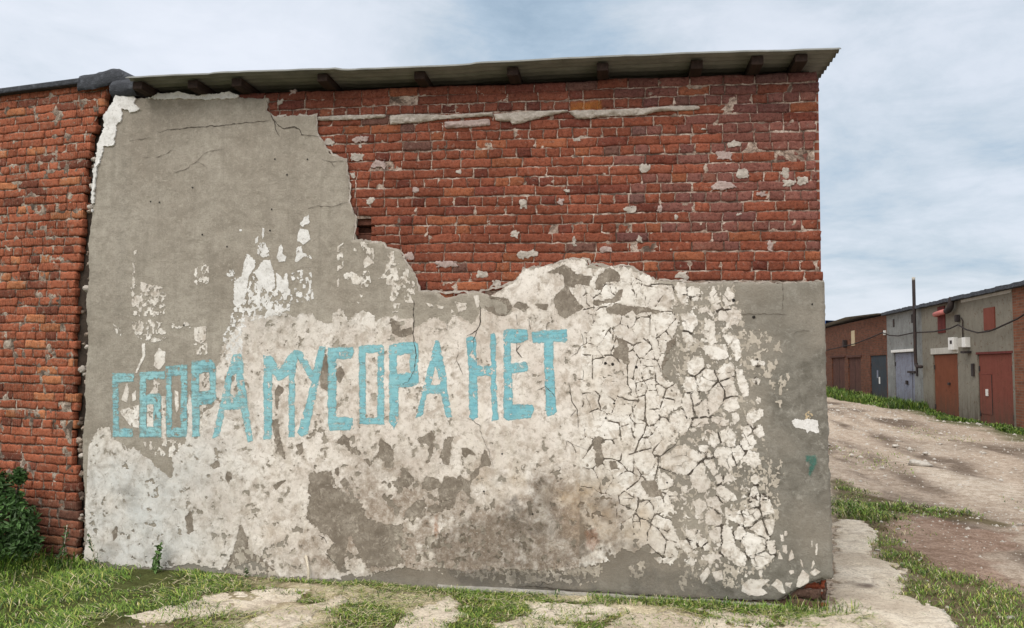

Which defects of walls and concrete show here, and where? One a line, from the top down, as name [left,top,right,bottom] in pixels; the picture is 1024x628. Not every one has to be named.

crack [132,102,314,172]
crack [409,300,417,379]
peeling [83,72,823,586]
crack [456,305,481,374]
crack [521,259,810,603]
spalling [678,531,832,609]